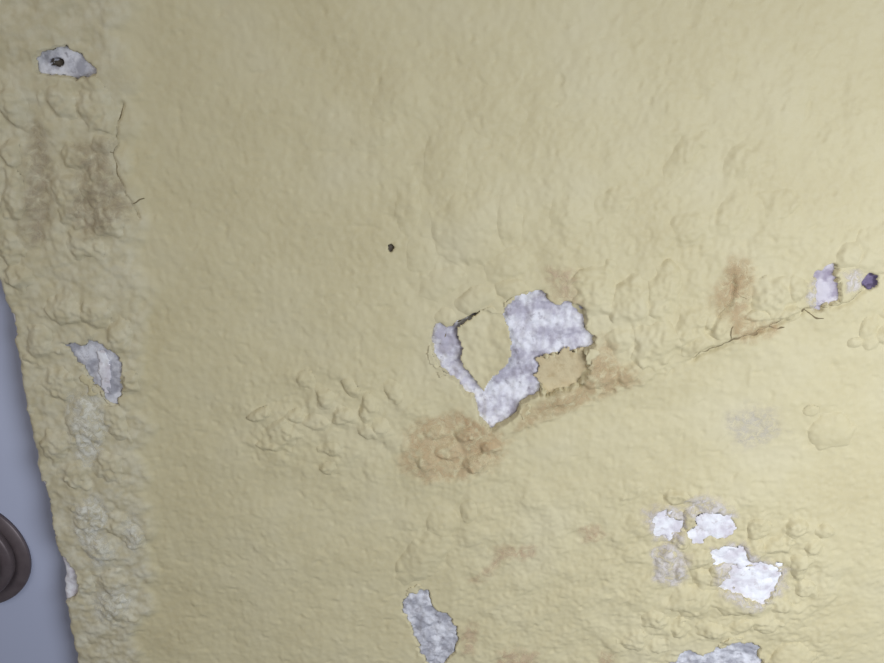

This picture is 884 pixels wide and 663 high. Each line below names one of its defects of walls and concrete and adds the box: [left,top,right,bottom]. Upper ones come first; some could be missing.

peeling [37,45,97,79]
peeling [813,263,838,310]
crack [695,290,861,357]
peeling [65,340,123,403]
peeling [427,290,600,428]
peeling [652,509,783,604]
peeling [402,584,459,663]
peeling [670,637,762,663]